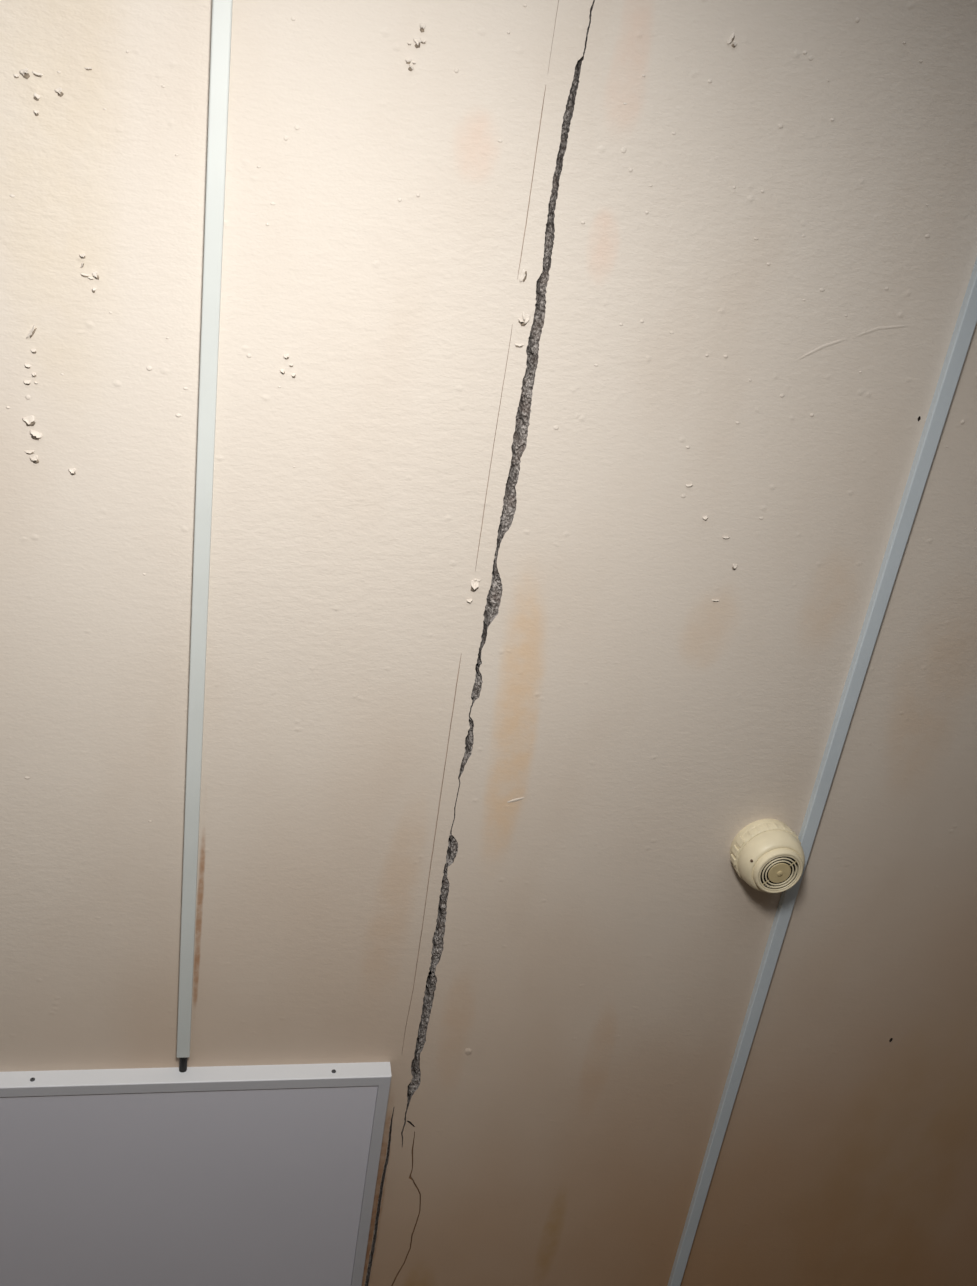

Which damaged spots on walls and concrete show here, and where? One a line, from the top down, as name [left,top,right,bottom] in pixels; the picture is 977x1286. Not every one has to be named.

crack [365,0,595,1286]